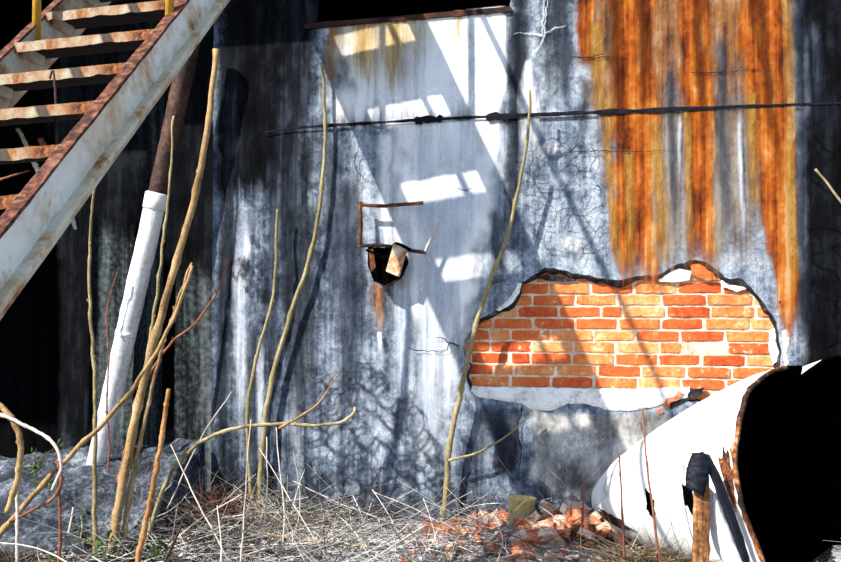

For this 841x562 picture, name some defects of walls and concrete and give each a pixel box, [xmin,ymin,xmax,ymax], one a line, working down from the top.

water stain [162,0,315,466]
crack [298,361,453,519]
corrosion [374,282,383,348]
spalling [369,247,409,287]
water stain [326,0,528,427]
crack [409,337,459,353]
crack [262,0,841,261]
spalling [461,260,790,415]
corrosion [576,0,800,336]
water stain [795,0,841,366]